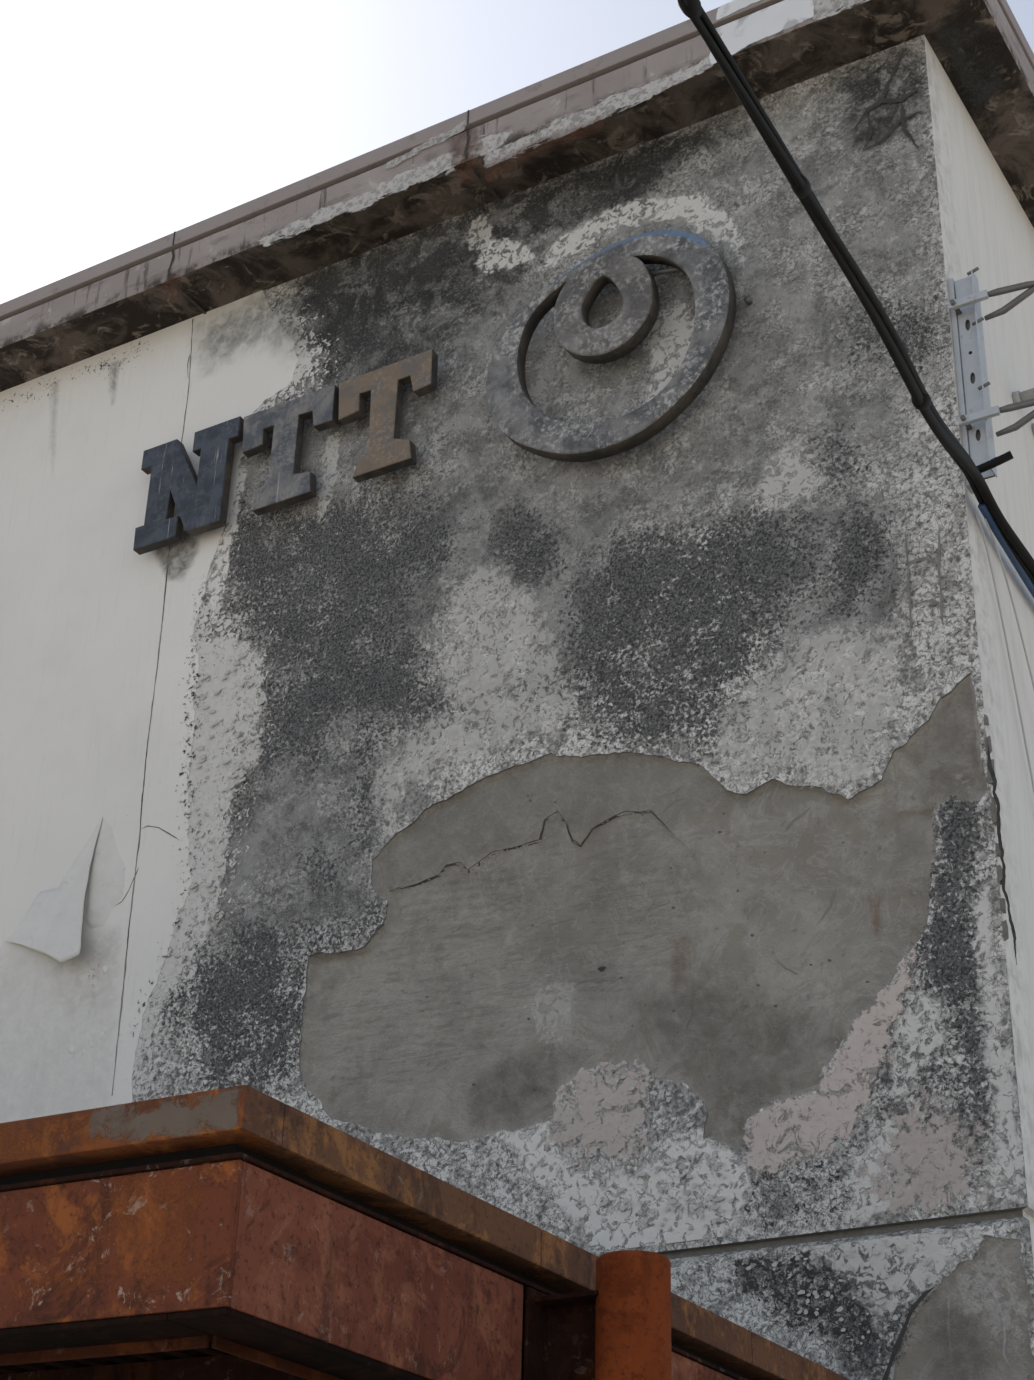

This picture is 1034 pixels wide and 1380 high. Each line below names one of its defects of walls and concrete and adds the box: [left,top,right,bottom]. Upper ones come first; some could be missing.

peeling [256,56,713,247]
damp [219,112,745,386]
damp [646,303,695,402]
mould [833,290,949,393]
peeling [5,817,125,963]
crack [111,546,179,1096]
damp [120,413,917,1097]
flaking render [299,673,1017,1175]
peeling [856,1078,999,1217]
flaking render [772,1236,1034,1380]